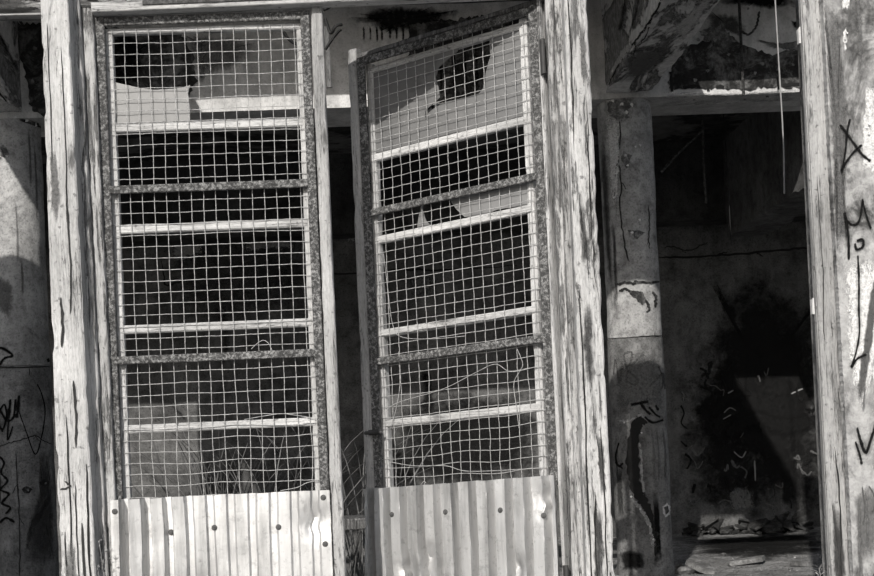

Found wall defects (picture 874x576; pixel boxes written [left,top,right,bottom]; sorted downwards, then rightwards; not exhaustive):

spalling [0,0,46,128]
spalling [668,24,799,105]
peeling [861,88,874,176]
peeling [833,510,845,576]